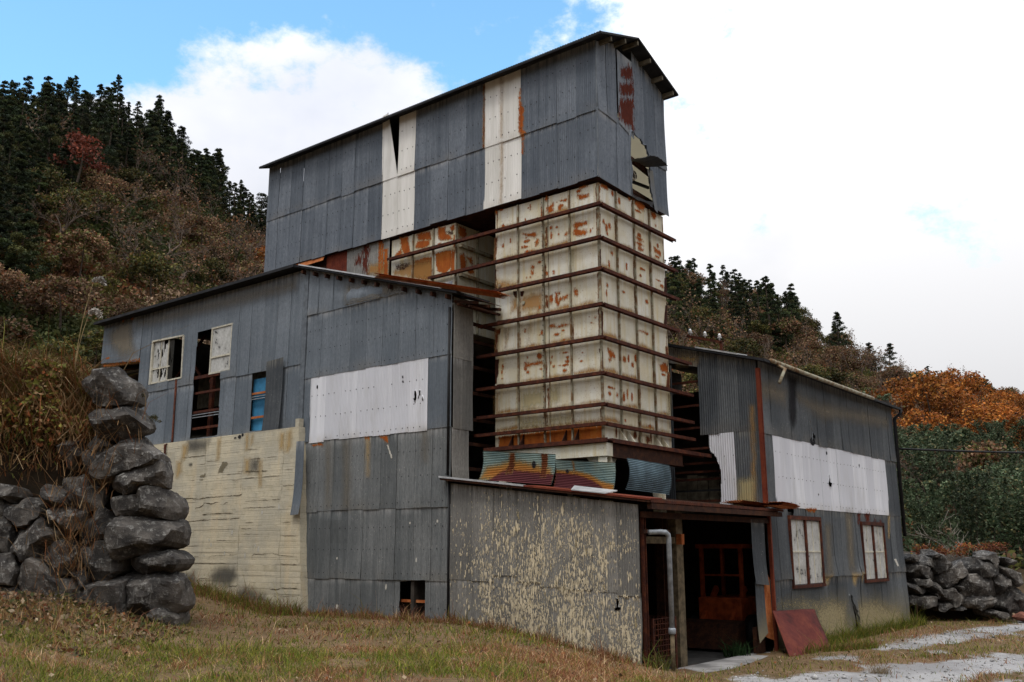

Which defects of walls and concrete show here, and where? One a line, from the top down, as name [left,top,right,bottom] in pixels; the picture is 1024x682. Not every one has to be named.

rust [518,89,526,154]
rust [617,50,635,139]
rust [354,225,474,280]
rust [481,183,695,490]